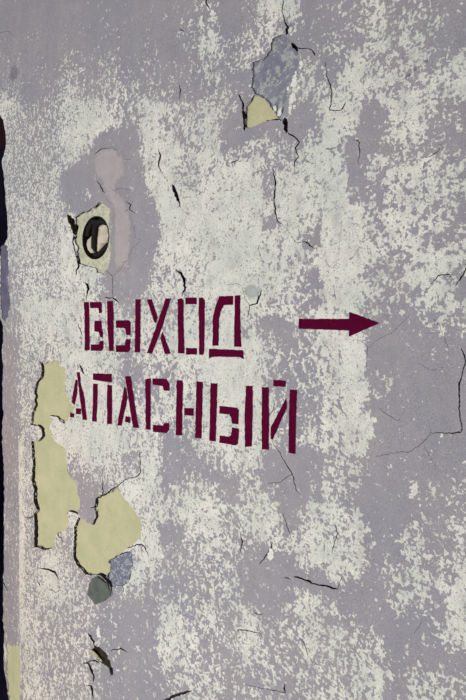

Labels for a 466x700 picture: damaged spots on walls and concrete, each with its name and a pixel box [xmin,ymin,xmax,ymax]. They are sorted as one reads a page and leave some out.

spalling [238,34,306,133]
crack [298,47,346,111]
peeling [67,202,111,275]
crack [425,268,466,292]
crack [384,320,466,469]
peeling [30,360,149,604]
crack [285,576,342,590]
peeling [6,643,21,700]
spalling [88,626,113,675]